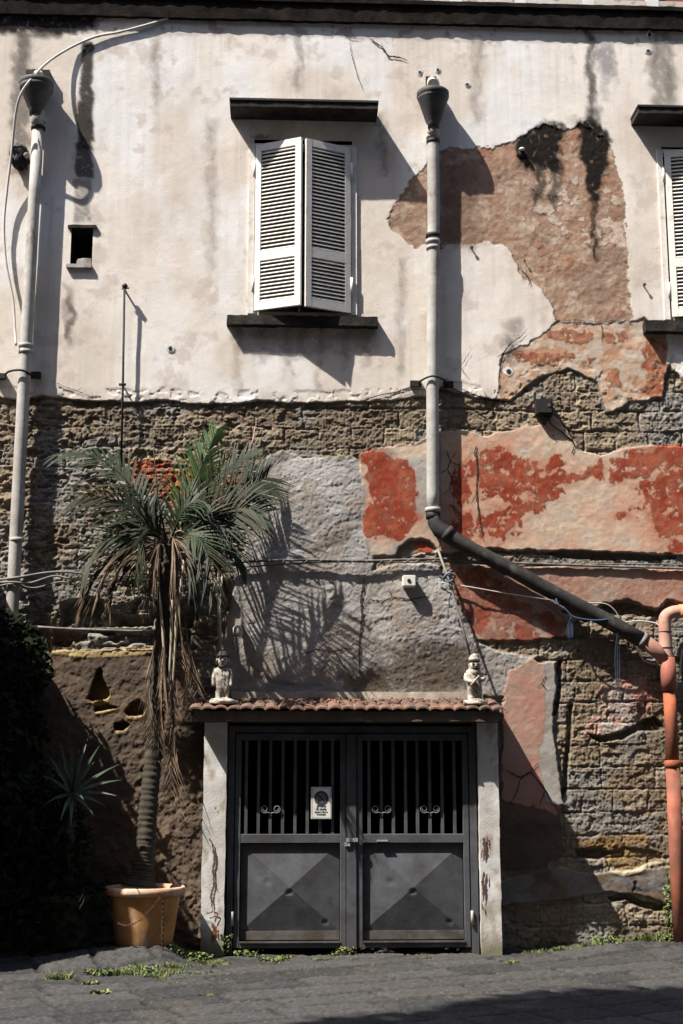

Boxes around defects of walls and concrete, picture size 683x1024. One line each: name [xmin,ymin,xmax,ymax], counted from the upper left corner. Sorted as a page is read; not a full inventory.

crack [343,33,406,91]
water stain [515,32,613,237]
flaking render [0,127,683,609]
crack [507,764,553,805]